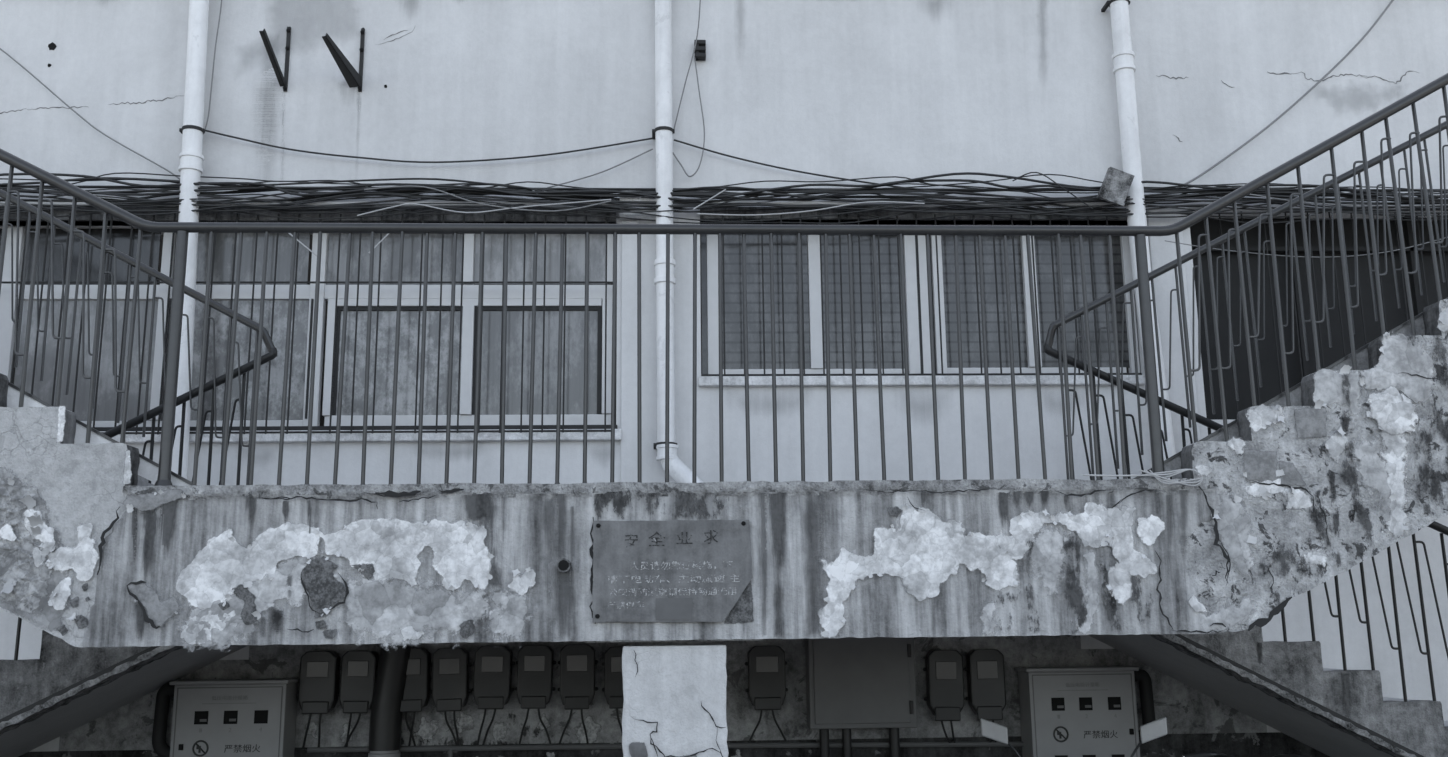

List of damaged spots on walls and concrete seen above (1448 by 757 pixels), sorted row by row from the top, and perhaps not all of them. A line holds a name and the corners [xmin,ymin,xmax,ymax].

crack [1268,71,1418,84]
peeling [0,467,99,636]
peeling [57,406,66,442]
peeling [128,517,536,645]
water stain [336,493,532,648]
water stain [594,490,724,519]
water stain [761,493,786,636]
peeling [818,502,1165,638]
water stain [999,491,1068,524]
peeling [1227,332,1434,541]
water stain [1410,402,1448,515]
crack [632,703,726,757]